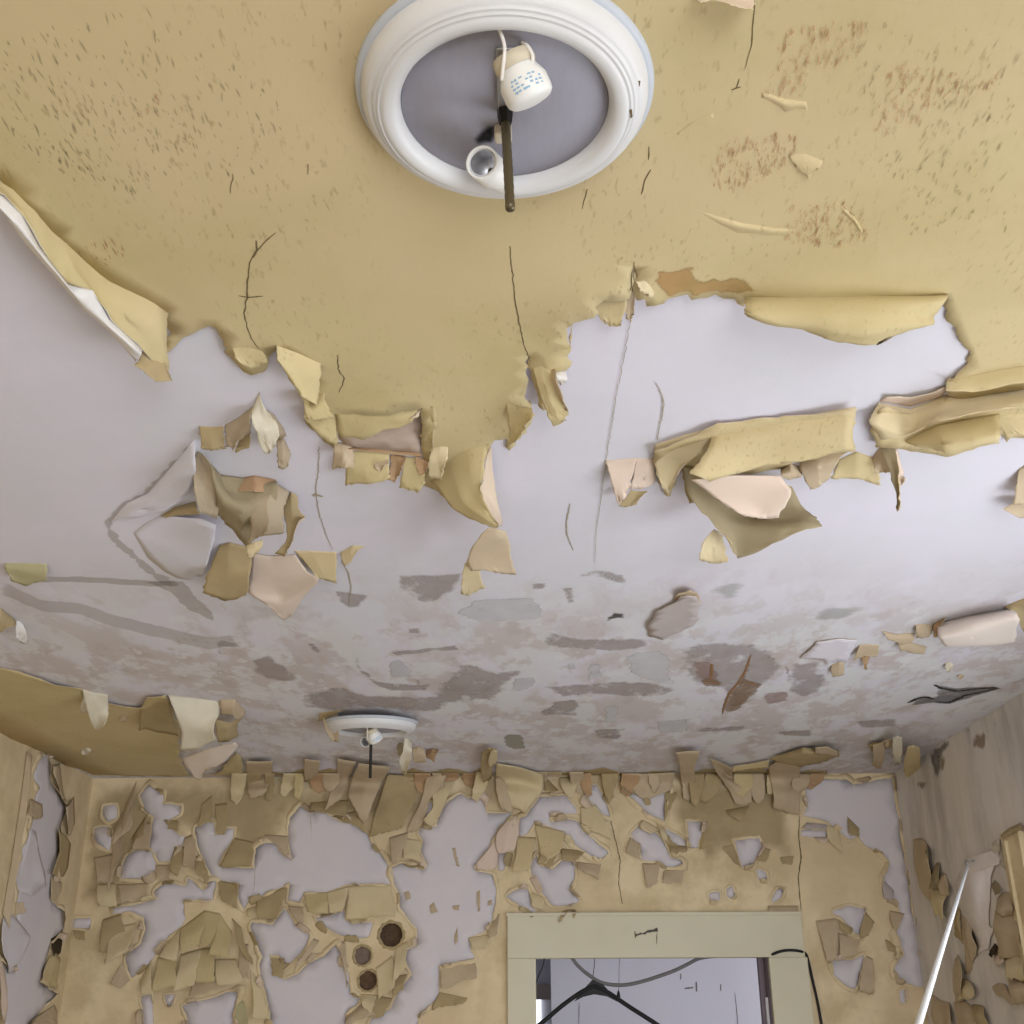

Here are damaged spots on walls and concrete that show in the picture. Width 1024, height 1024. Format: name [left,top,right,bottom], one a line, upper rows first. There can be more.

crack [732,1,755,90]
crack [241,233,275,349]
peeling [0,0,1024,620]
crack [510,247,530,361]
crack [566,327,630,559]
crack [312,447,352,603]
leakage [505,734,525,749]
peeling [800,598,1024,677]
crack [908,685,998,703]
peeling [0,668,1024,1024]